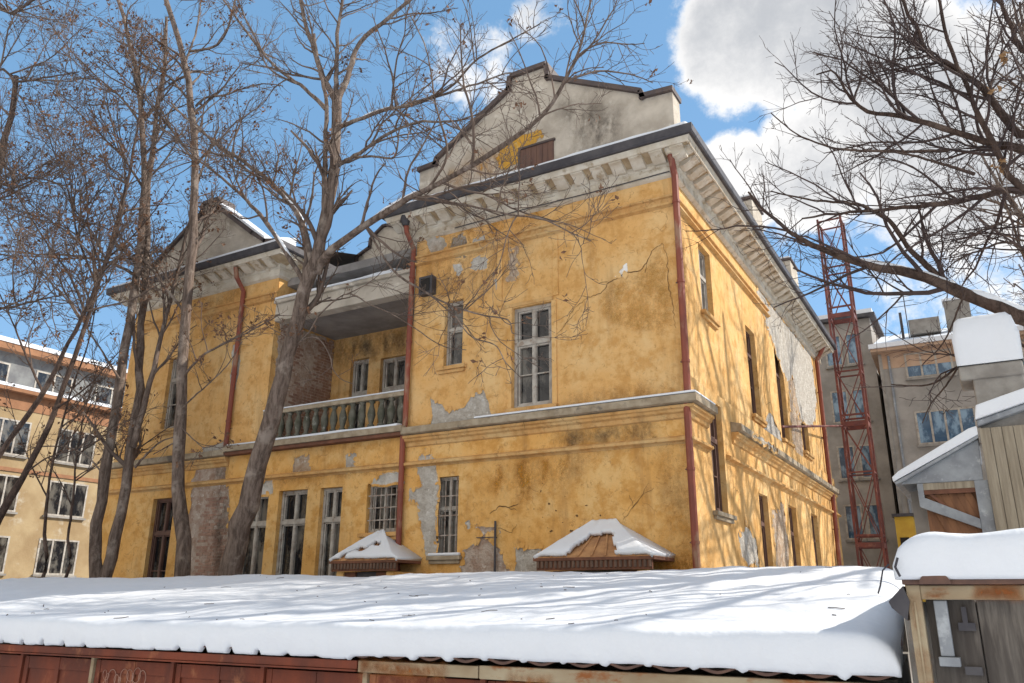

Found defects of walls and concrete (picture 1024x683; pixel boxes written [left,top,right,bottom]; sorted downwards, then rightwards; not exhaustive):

peeling [424,230,522,291]
crack [549,246,690,340]
peeling [752,286,817,457]
peeling [428,387,495,424]
flaking render [188,467,230,576]
peeling [370,446,441,556]
peeling [455,520,543,573]
peeling [738,517,760,567]
peeling [771,501,790,567]